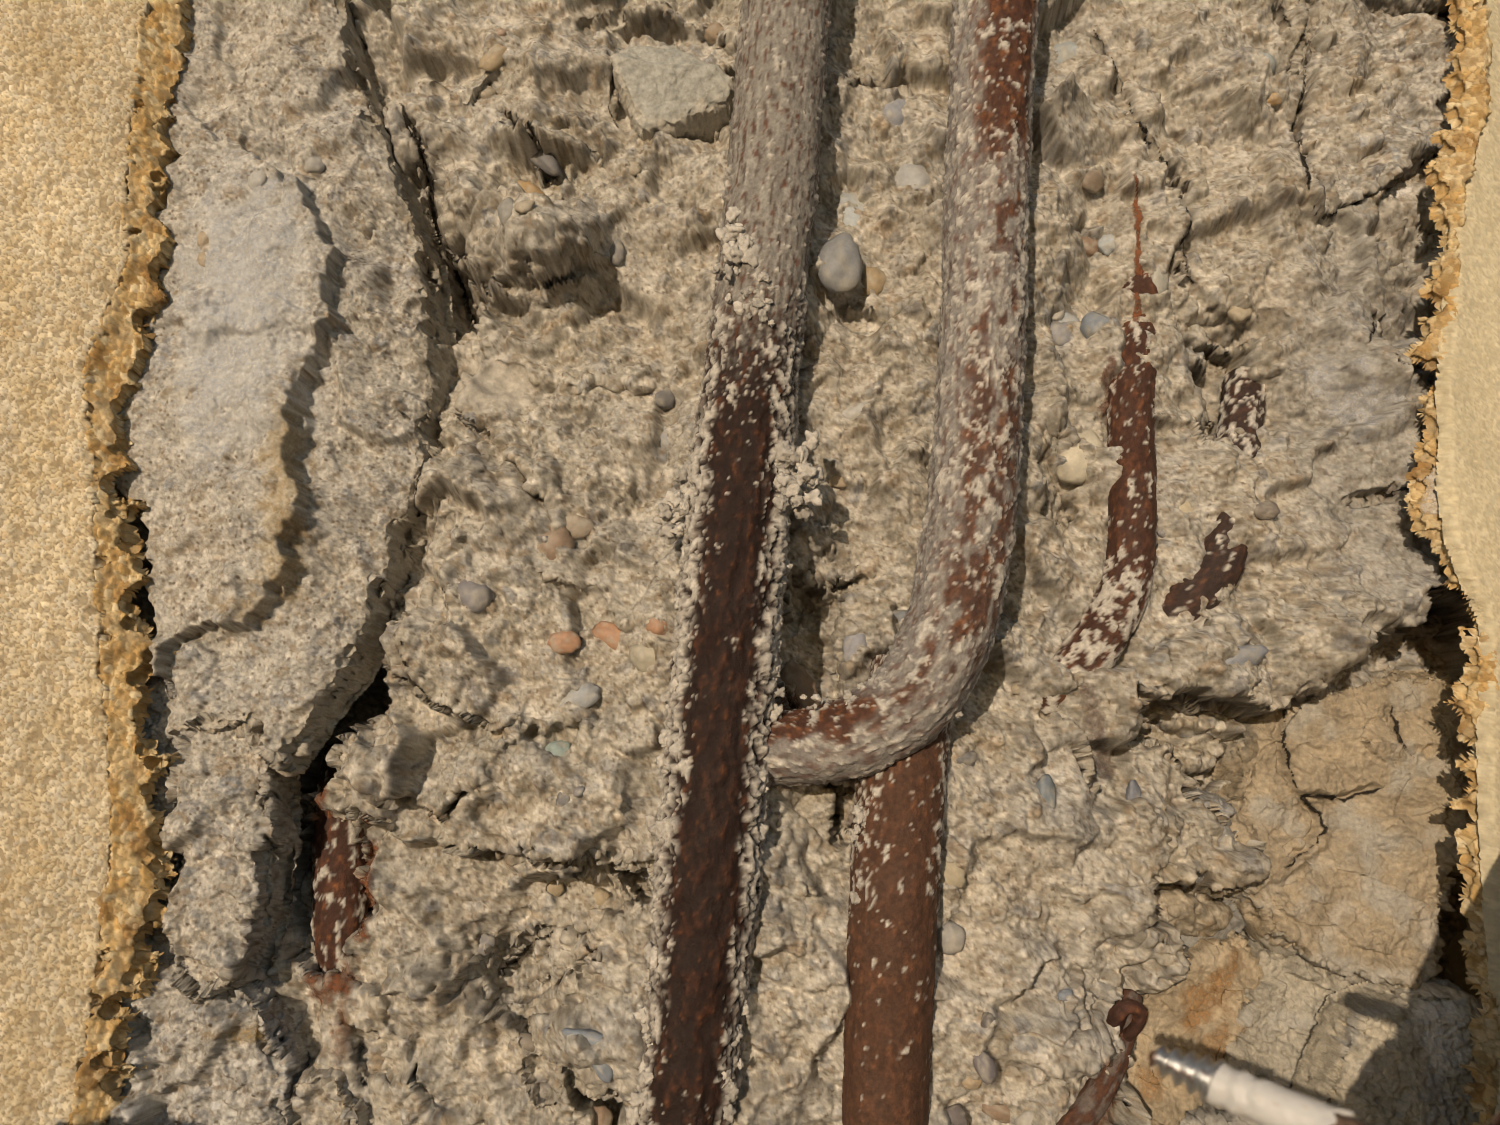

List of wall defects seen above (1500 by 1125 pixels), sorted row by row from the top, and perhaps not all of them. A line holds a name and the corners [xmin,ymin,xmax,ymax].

crack [380,103,477,333]
rust [1132,174,1144,321]
crack [1297,139,1372,220]
spalling [776,0,952,709]
spalling [255,0,742,1125]
spalling [928,0,1500,1125]
rust [775,685,802,711]
crack [1280,709,1384,867]
crack [1390,706,1415,758]
rust [304,963,353,1053]
rust [355,820,378,940]
spalling [733,778,856,1125]